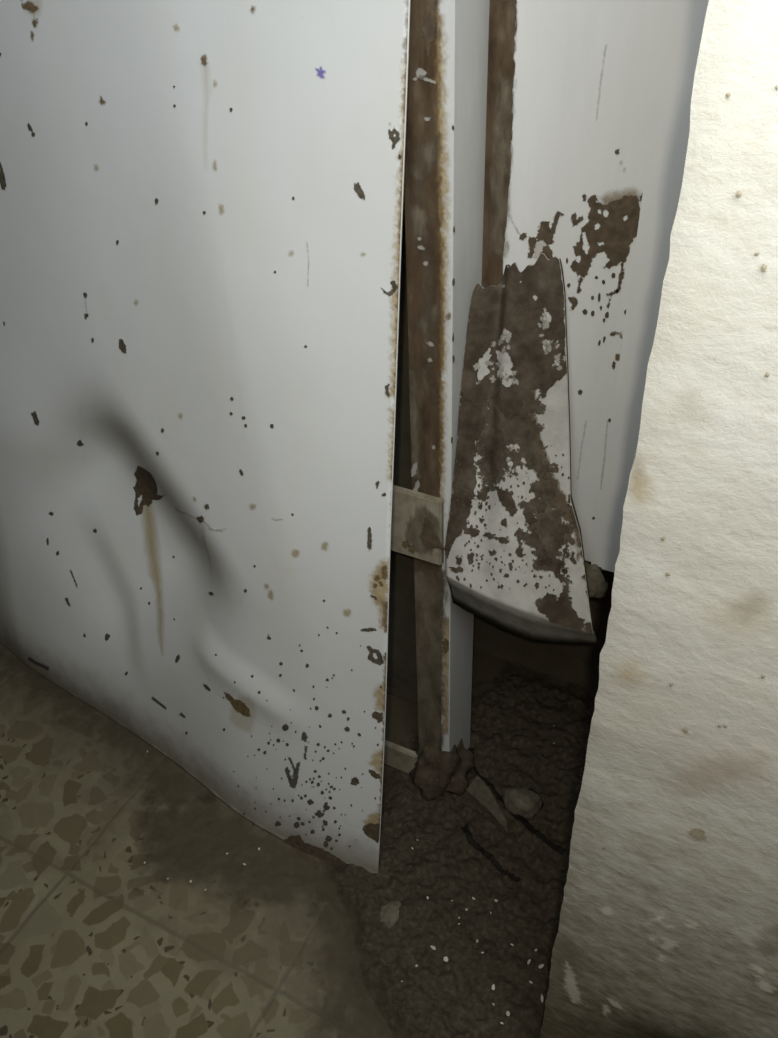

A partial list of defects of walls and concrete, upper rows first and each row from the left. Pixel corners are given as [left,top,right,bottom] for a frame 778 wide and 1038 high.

rust [392,0,643,753]
rust [133,466,162,596]
rust [370,562,389,632]
peeling [449,452,571,591]
peeling [243,674,386,855]
rust [365,655,387,824]